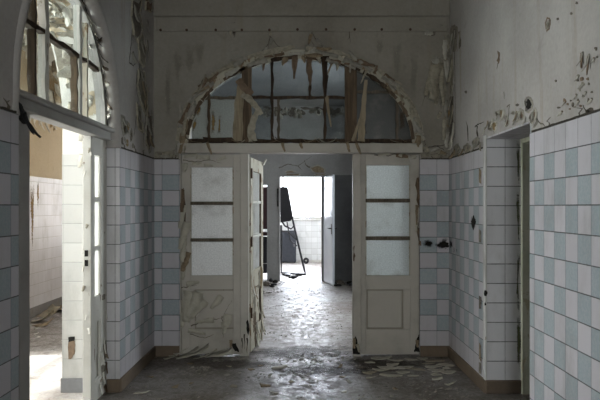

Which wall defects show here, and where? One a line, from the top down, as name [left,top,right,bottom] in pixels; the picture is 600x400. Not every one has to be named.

peeling [121,0,545,172]
peeling [557,74,593,117]